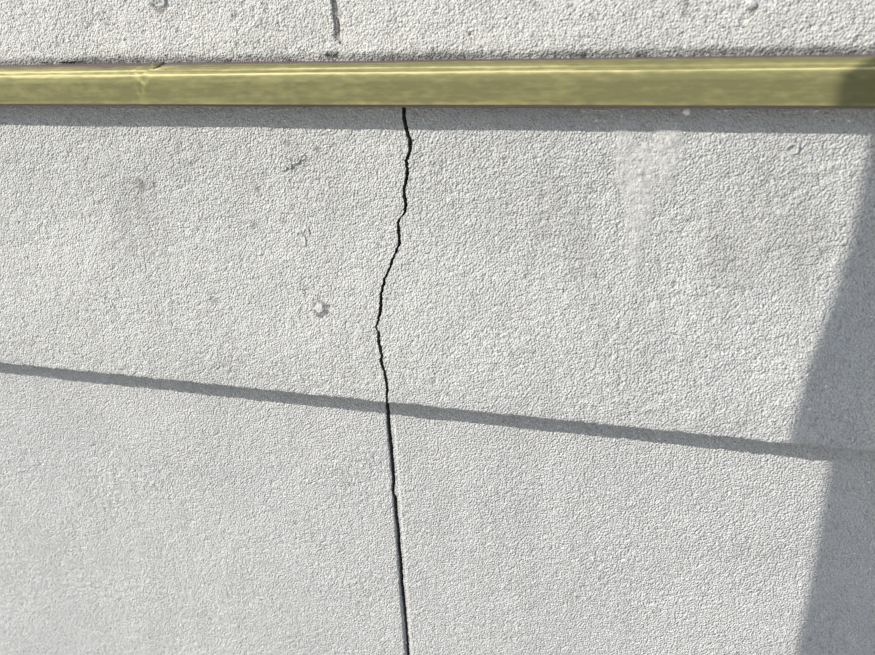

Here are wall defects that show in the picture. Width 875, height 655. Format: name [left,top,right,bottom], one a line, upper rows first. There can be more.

crack [375,107,413,655]